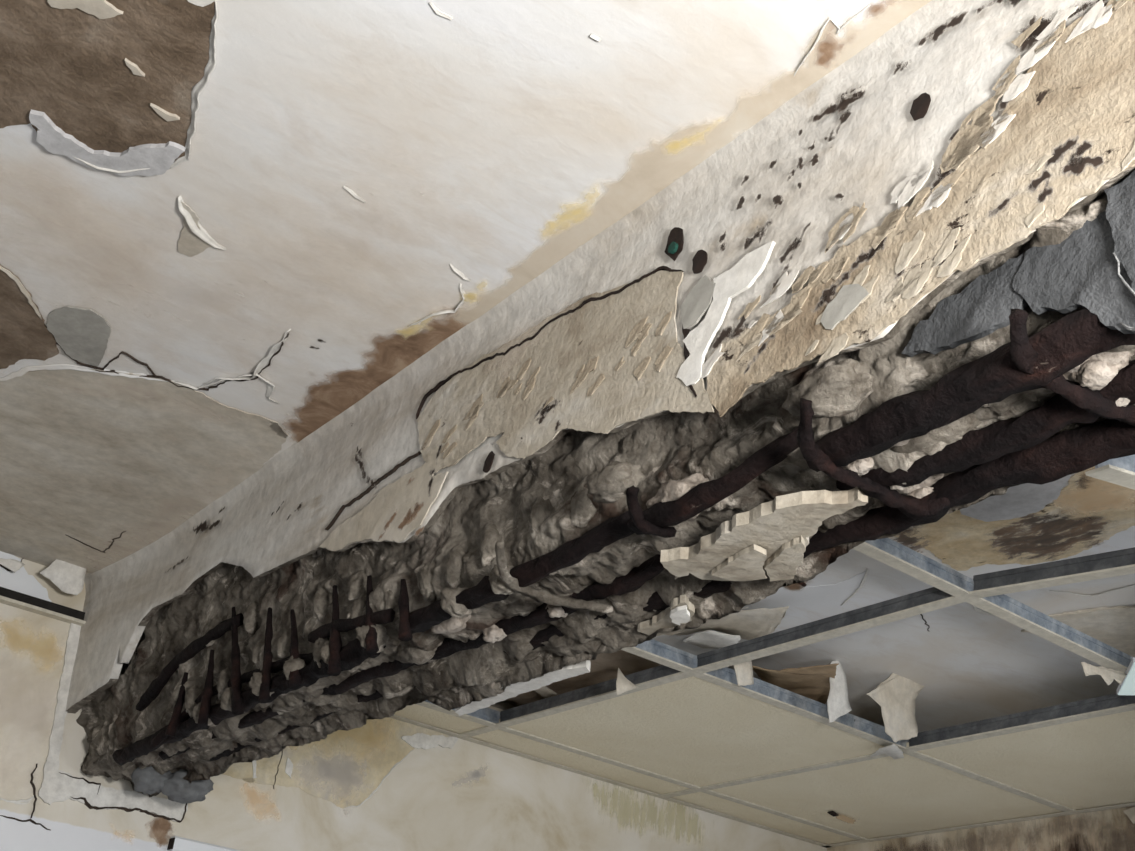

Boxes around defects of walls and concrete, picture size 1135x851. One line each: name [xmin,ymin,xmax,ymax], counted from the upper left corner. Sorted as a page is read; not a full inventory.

flaking render [29,0,218,176]
leakage [918,0,1022,46]
leakage [284,0,932,443]
peeling [699,0,1135,417]
leakage [1028,136,1104,203]
peeling [0,264,291,573]
crack [56,334,289,391]
rust [378,503,424,540]
crack [416,266,684,419]
spalling [76,170,1135,809]
rust [1056,477,1133,512]
crack [0,763,187,831]